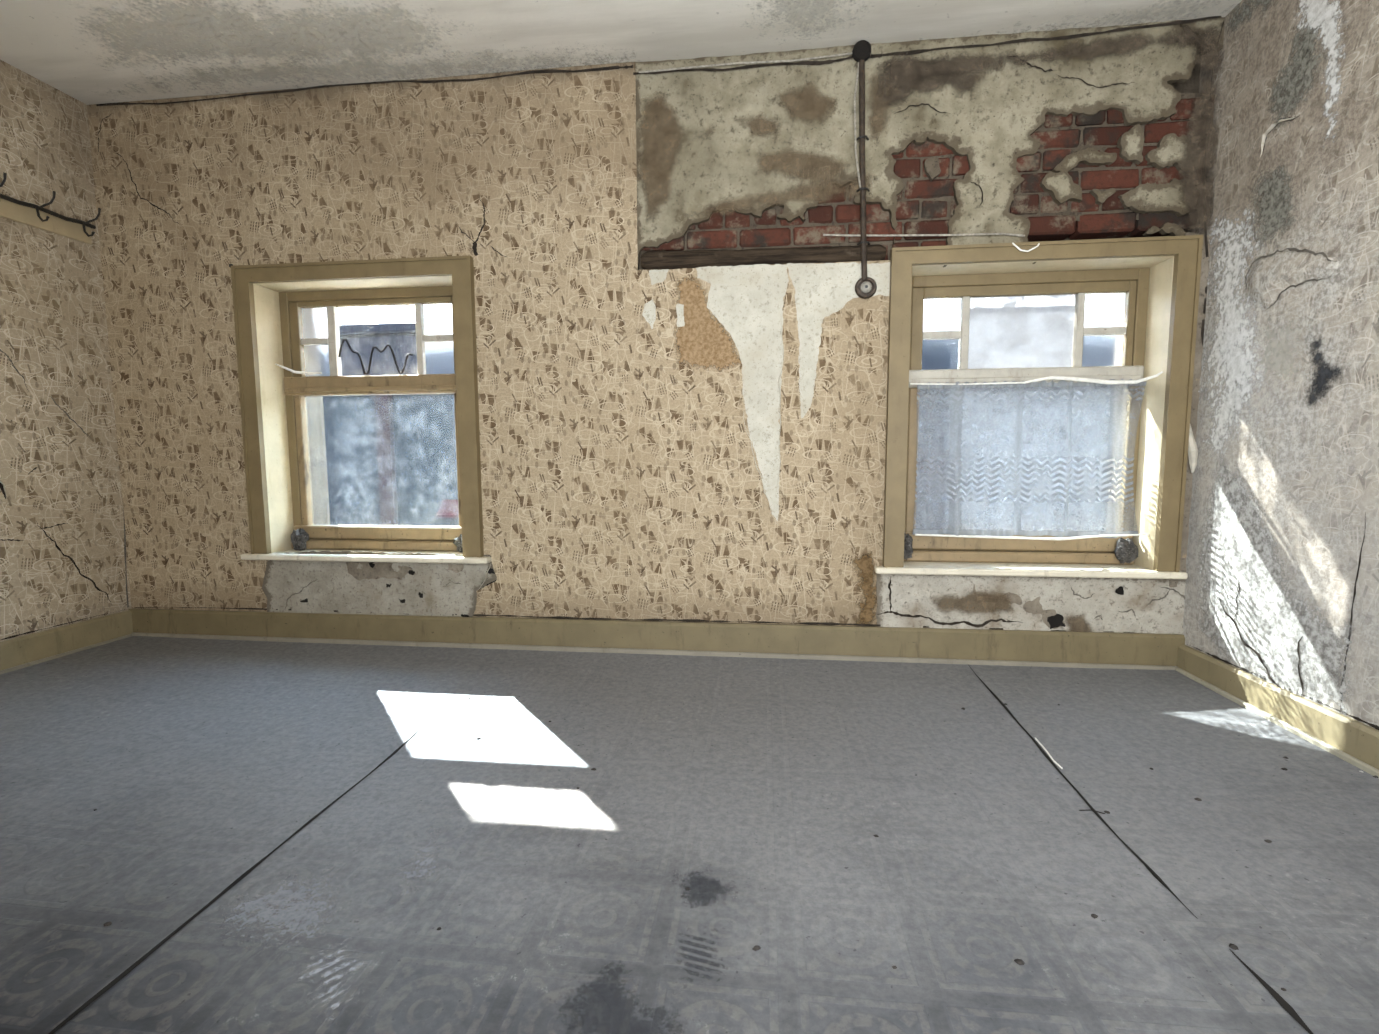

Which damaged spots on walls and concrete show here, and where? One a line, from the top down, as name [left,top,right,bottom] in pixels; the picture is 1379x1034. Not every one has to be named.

water stain [701,152,870,215]
flaking render [635,17,1225,634]
water stain [870,0,1352,712]
flaking render [262,551,497,617]
crack [878,578,1023,628]